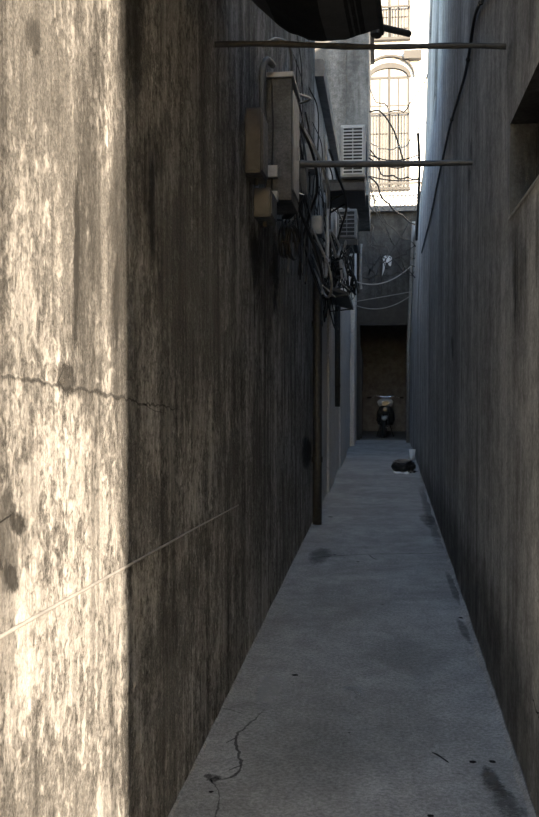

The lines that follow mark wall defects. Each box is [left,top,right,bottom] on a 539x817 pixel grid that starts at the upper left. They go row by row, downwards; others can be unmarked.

crack [0,371,174,413]
damp [0,495,26,594]
damp [434,494,539,817]
crack [211,708,262,817]